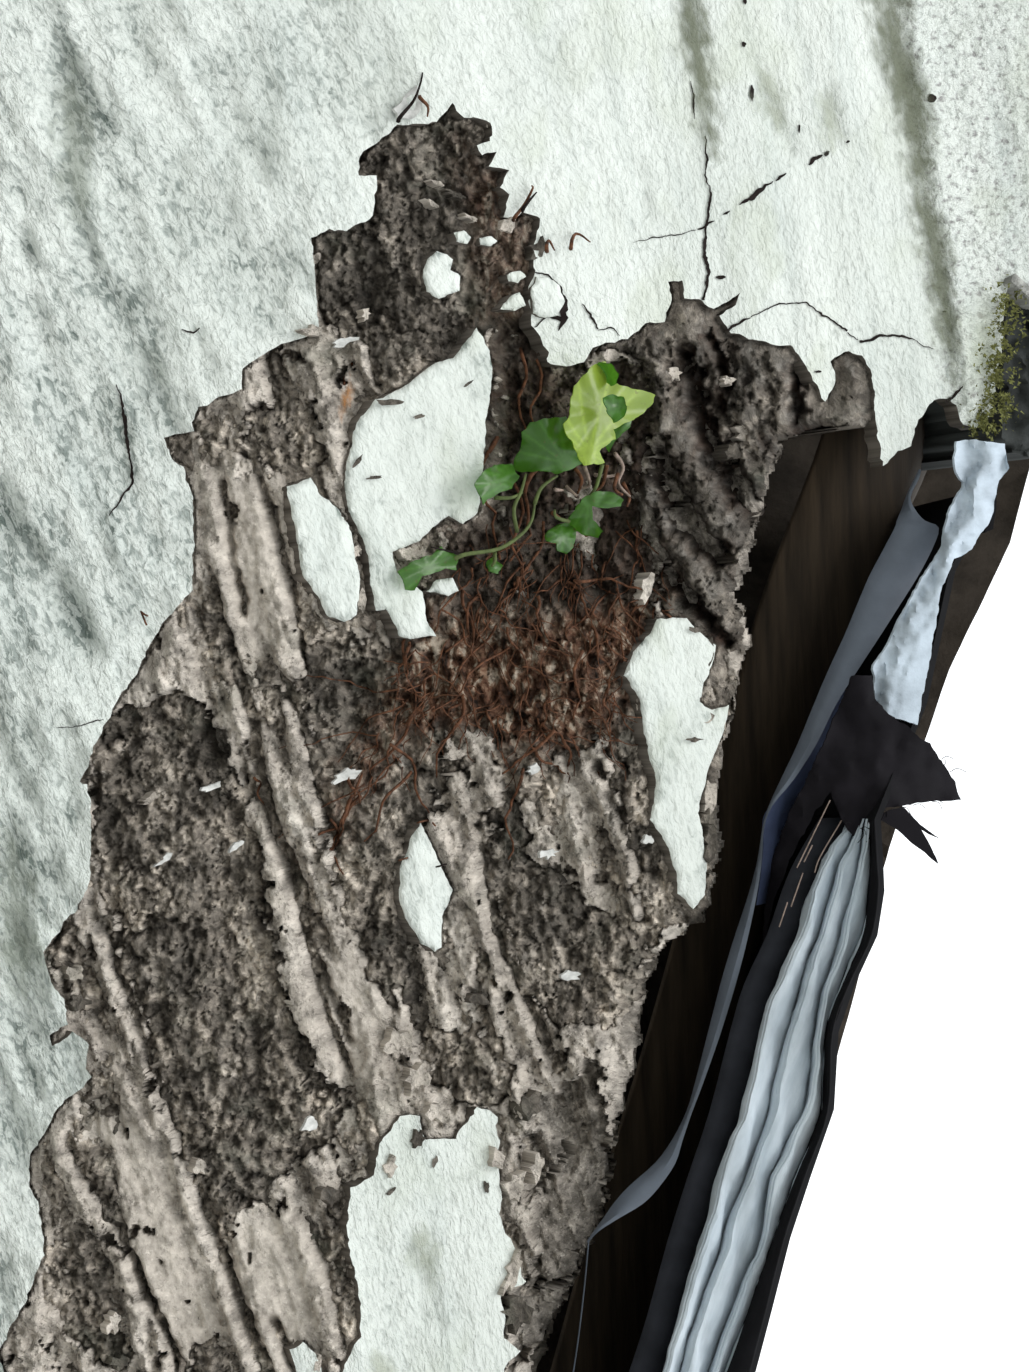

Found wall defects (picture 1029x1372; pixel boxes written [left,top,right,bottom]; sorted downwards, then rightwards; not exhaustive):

spalling [391,72,430,123]
water stain [682,0,717,155]
crack [636,81,850,300]
water stain [876,0,960,351]
crack [727,302,933,349]
crack [109,384,134,516]
spalling [0,110,872,1372]